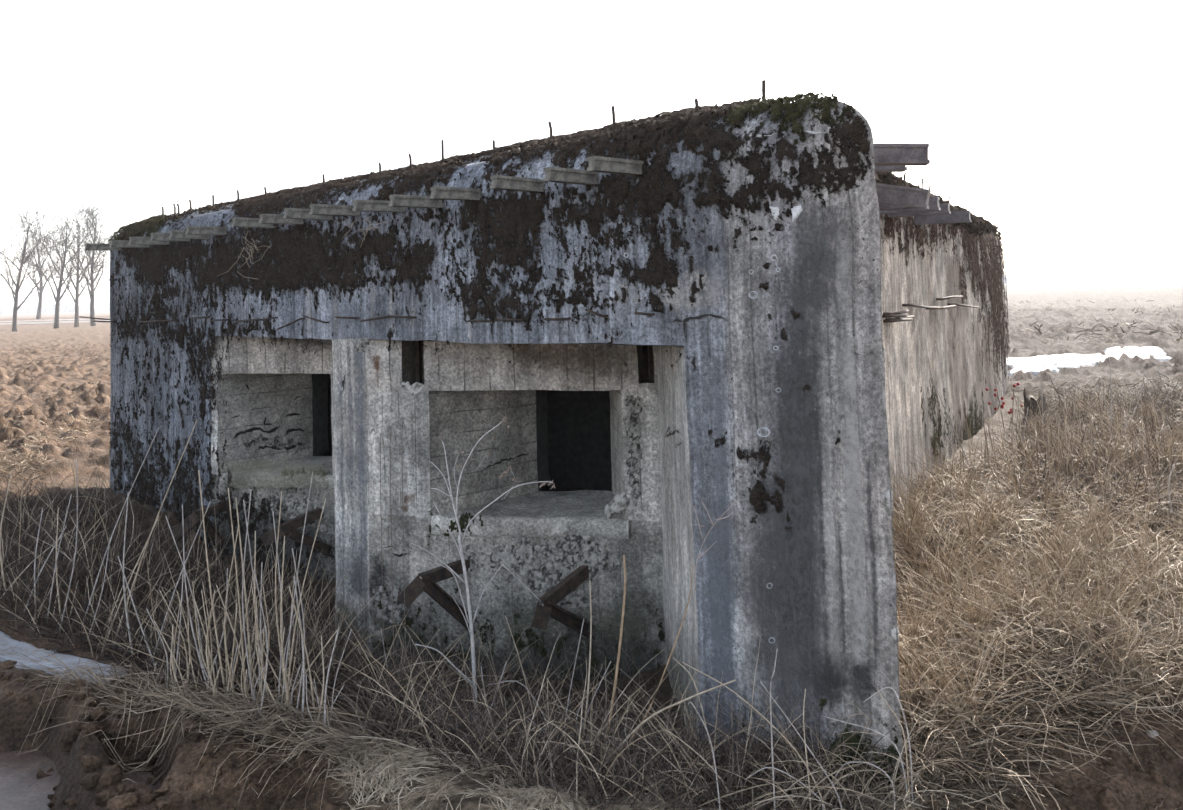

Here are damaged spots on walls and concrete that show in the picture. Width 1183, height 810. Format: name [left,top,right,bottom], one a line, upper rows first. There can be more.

damp [664,273,719,307]
damp [928,258,998,450]
damp [750,212,877,728]
spalling [463,535,621,610]